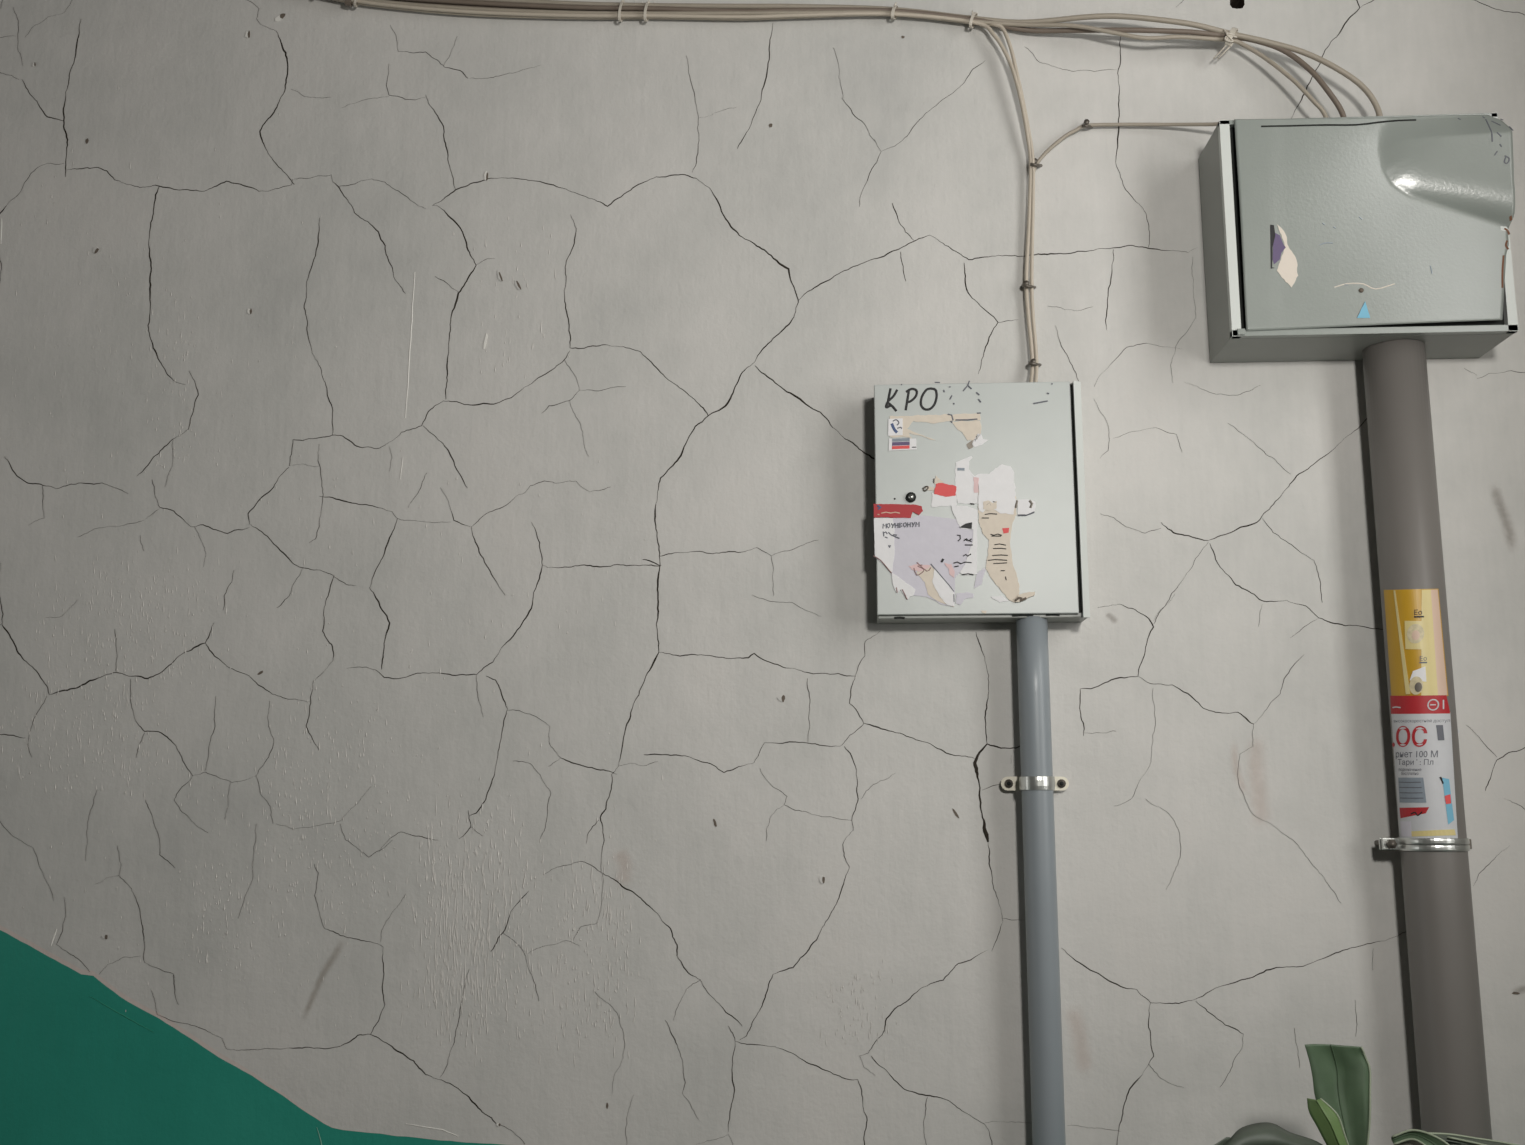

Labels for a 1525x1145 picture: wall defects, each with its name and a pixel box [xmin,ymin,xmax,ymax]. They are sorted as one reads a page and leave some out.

crack [1291,0,1374,119]
crack [1110,280,1256,396]
crack [0,1,1198,1145]
crack [1079,418,1383,903]
crack [1469,727,1525,809]
crack [1063,932,1405,1141]